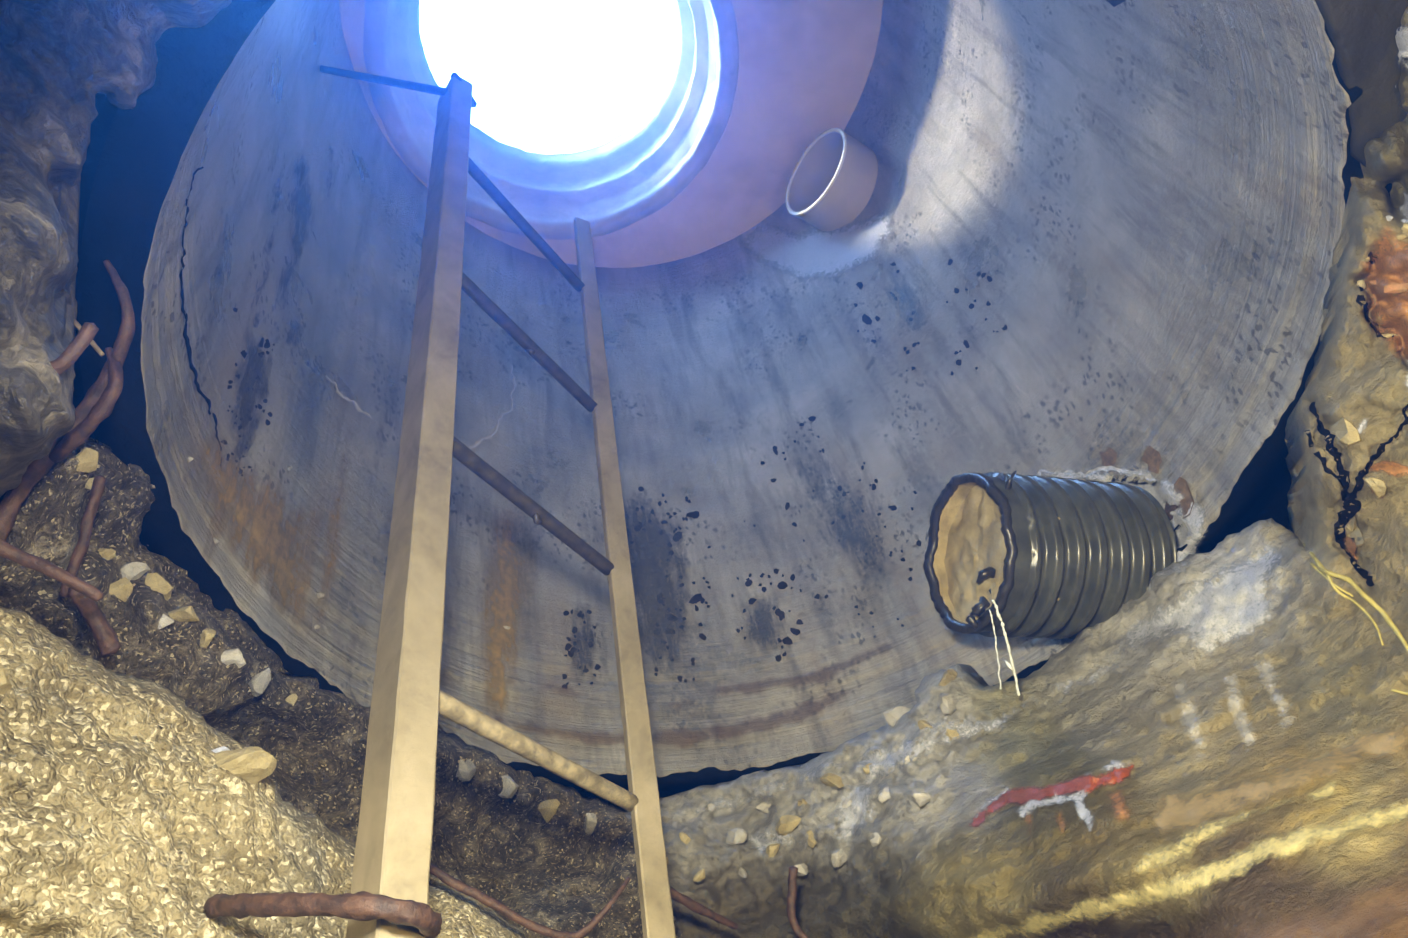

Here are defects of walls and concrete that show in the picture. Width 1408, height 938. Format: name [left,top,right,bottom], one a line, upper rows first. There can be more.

crack [179,166,222,467]